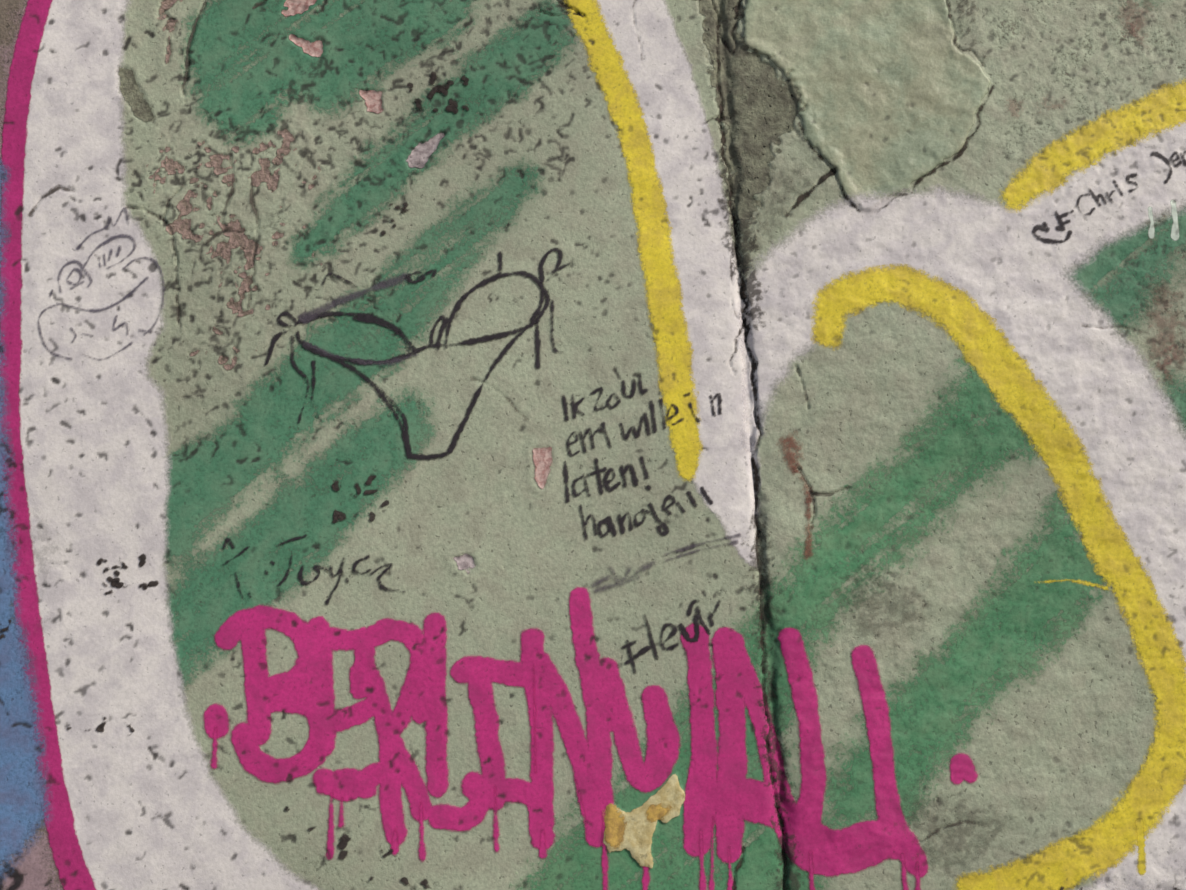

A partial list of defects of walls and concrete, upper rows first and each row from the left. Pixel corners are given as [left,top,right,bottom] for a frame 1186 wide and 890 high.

peeling [157,0,182,64]
peeling [282,0,316,17]
peeling [289,34,323,57]
peeling [119,67,154,121]
crack [786,0,994,217]
peeling [147,129,301,317]
crack [707,0,787,890]